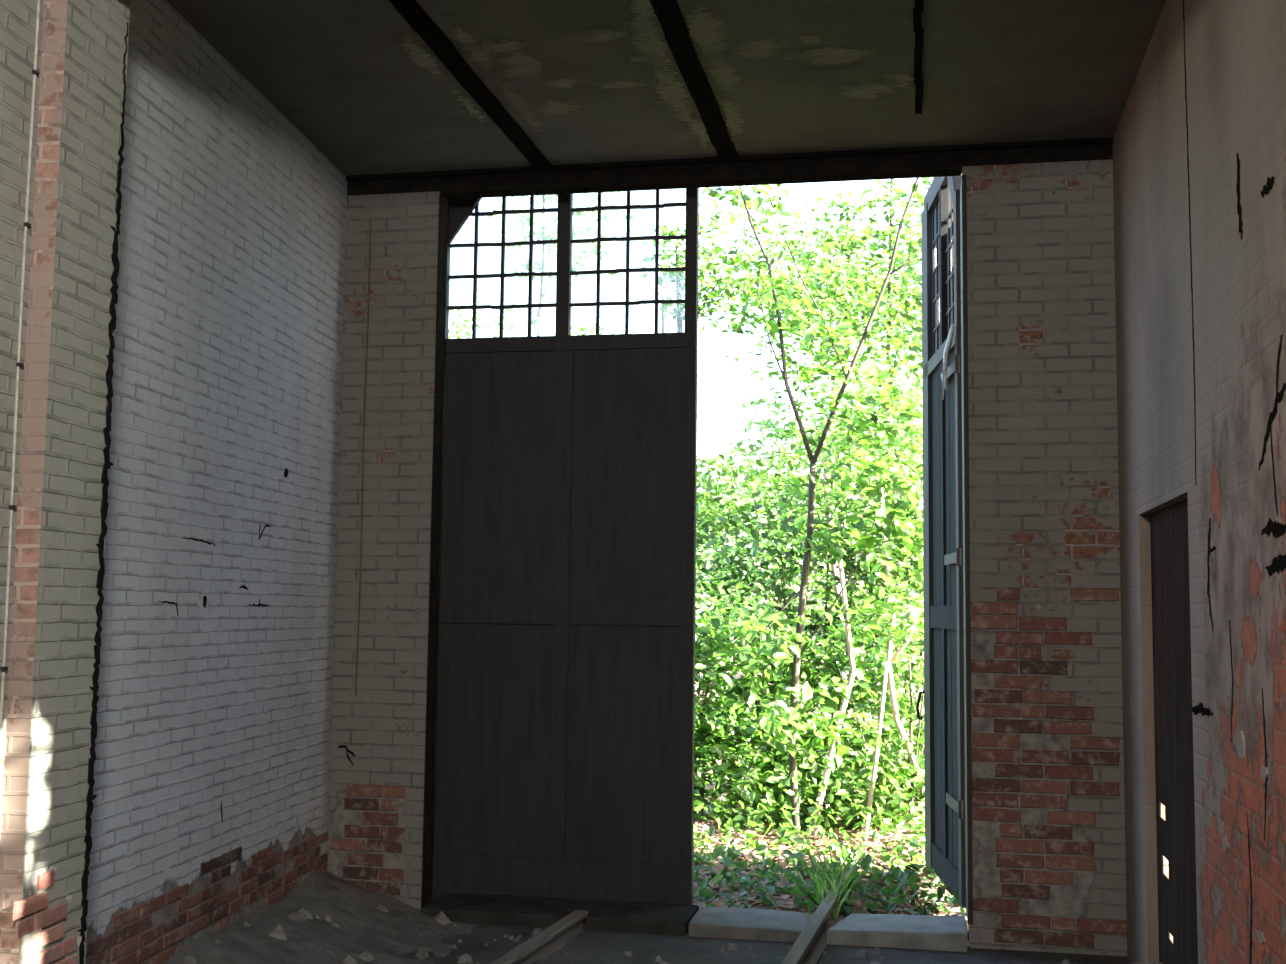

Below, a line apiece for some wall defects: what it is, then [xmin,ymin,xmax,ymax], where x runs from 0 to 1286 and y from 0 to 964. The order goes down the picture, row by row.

crack [78,22,128,964]
crack [1183,0,1196,485]
crack [1236,153,1275,239]
crack [1259,335,1286,576]
peeling [12,782,406,964]
crack [1191,519,1268,964]